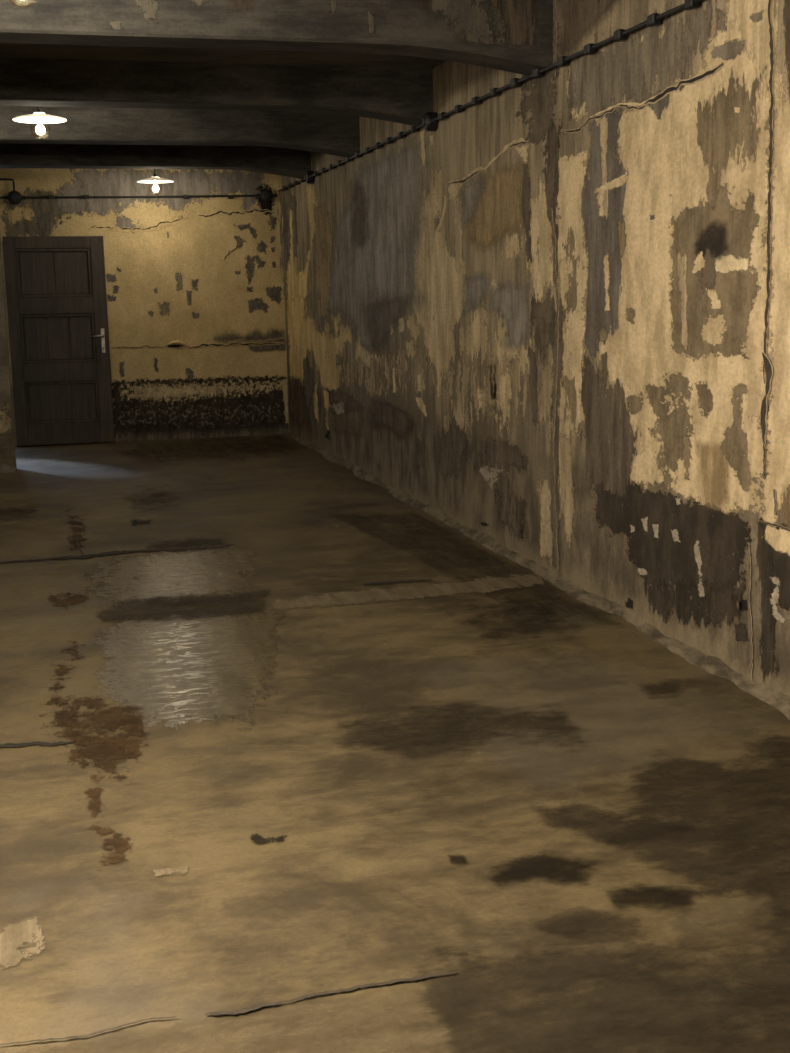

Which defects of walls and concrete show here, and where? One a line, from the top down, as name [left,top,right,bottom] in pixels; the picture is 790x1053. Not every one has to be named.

crack [560,62,723,133]
crack [88,209,275,261]
leakage [313,141,423,351]
peeling [106,267,121,302]
peeling [175,273,200,318]
peeling [233,0,790,567]
leakage [111,356,425,469]
crack [0,537,234,563]
spalling [734,600,749,642]
crack [0,739,75,747]
leakage [421,736,790,1053]
leakage [0,915,46,969]